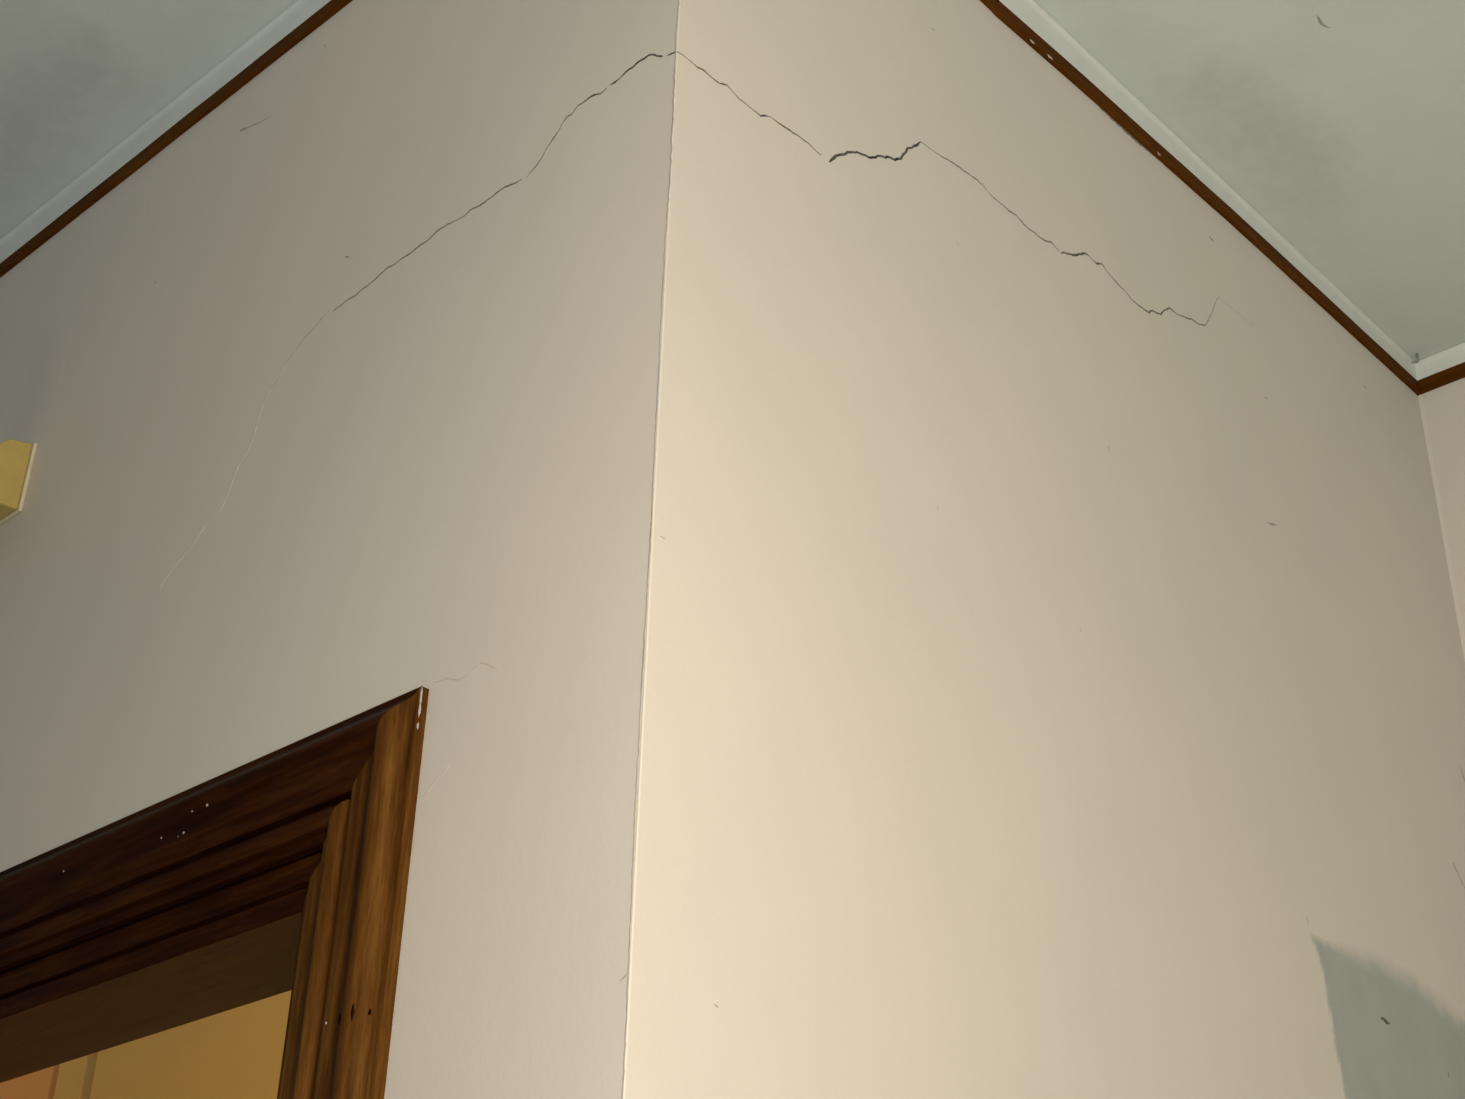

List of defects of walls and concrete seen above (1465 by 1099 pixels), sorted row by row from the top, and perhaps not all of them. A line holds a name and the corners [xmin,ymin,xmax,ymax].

crack [159,0,1254,1099]